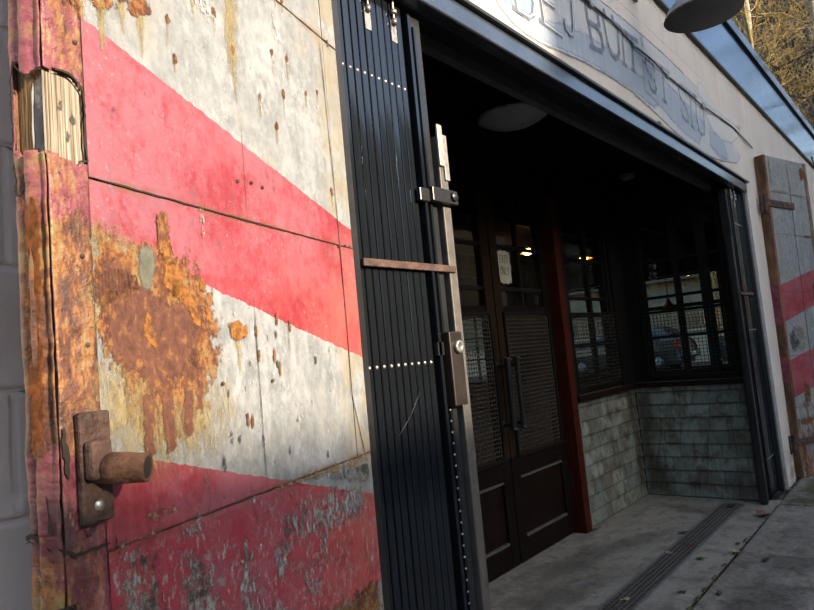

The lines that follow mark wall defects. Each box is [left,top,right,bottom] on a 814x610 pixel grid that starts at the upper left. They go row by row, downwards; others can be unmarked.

corrosion [63,0,152,52]
corrosion [21,197,47,460]
corrosion [82,210,248,469]
peeling [275,456,369,602]
peeling [119,530,166,610]
peeling [180,549,226,610]
peeling [232,541,288,610]
corrosion [320,579,383,610]